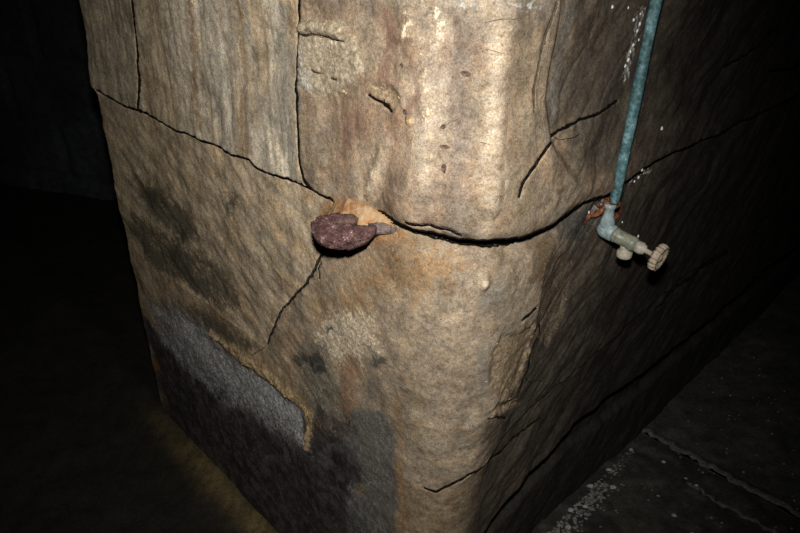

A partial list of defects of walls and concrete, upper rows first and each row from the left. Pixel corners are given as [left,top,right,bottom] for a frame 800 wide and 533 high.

leakage [622,7,646,82]
crack [96,0,341,203]
crack [368,94,393,113]
crack [518,2,618,198]
crack [378,196,601,248]
crack [251,247,325,356]
rust [308,224,463,331]
peeling [208,329,314,451]